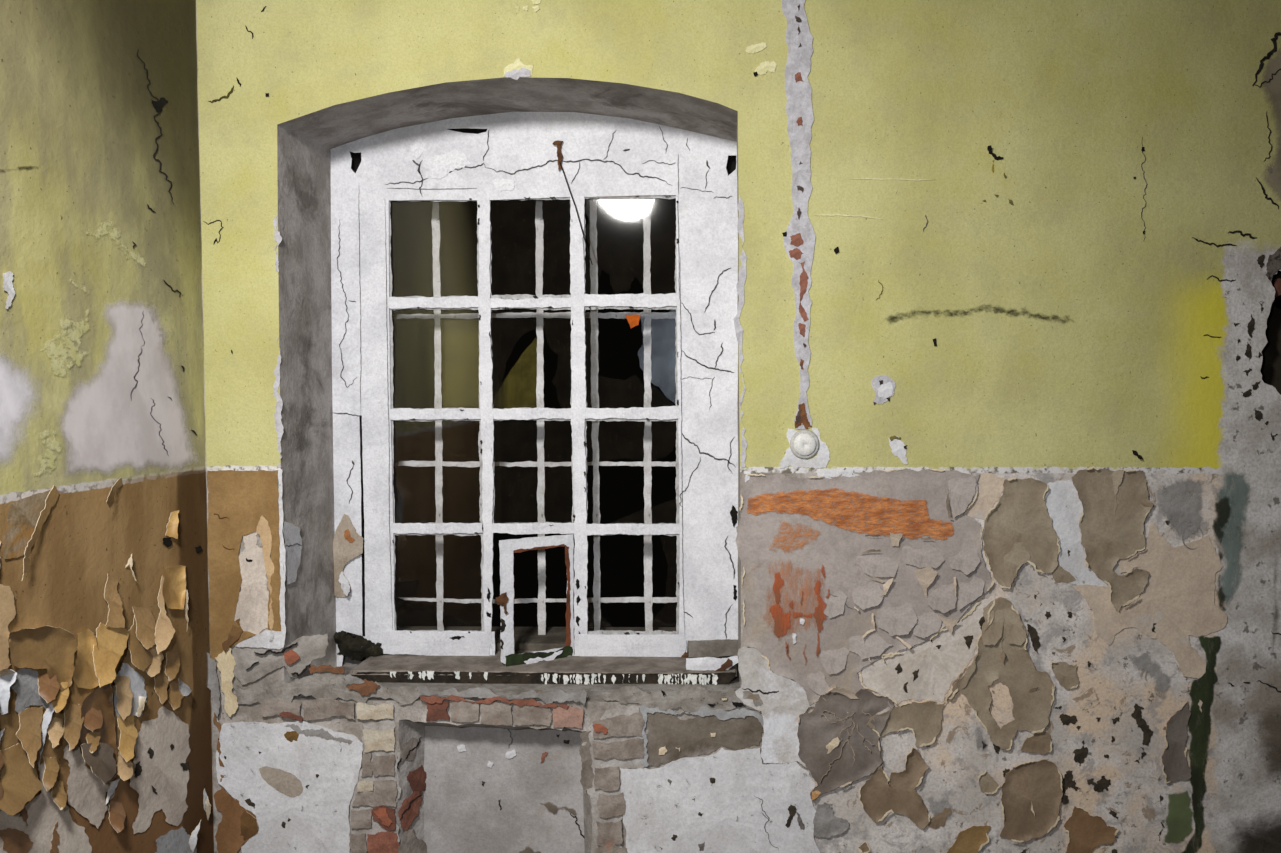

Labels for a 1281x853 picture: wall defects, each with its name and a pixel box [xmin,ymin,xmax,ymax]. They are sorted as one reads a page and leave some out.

crack [386,126,730,198]
flaking render [86,220,146,266]
flaking render [273,215,282,272]
crack [336,220,361,416]
crack [680,268,734,410]
flaking render [0,303,427,853]
crack [679,433,735,507]
crack [724,505,738,638]
peeling [417,196,1154,853]
corrosion [747,488,954,661]
peeling [1096,701,1191,804]
mould [1165,636,1221,853]